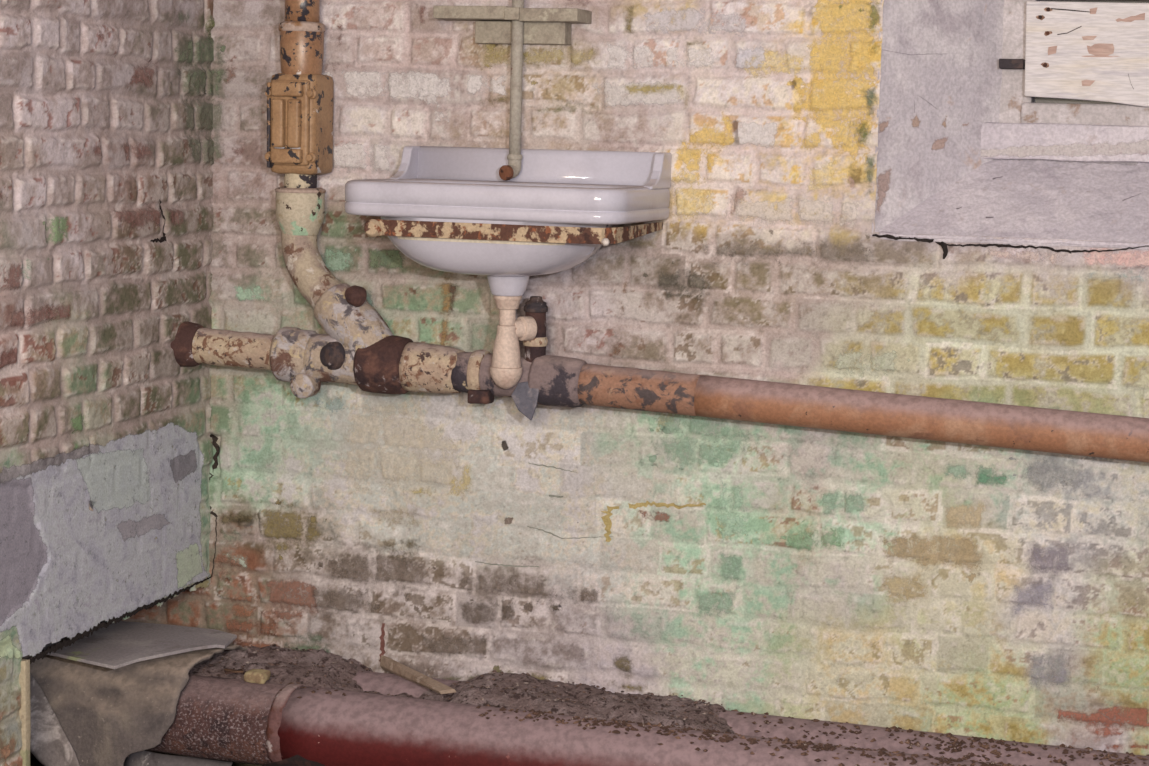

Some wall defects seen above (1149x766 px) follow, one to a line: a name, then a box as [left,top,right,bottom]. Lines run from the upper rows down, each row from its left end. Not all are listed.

peeling [0,415,241,659]
spalling [226,580,317,648]